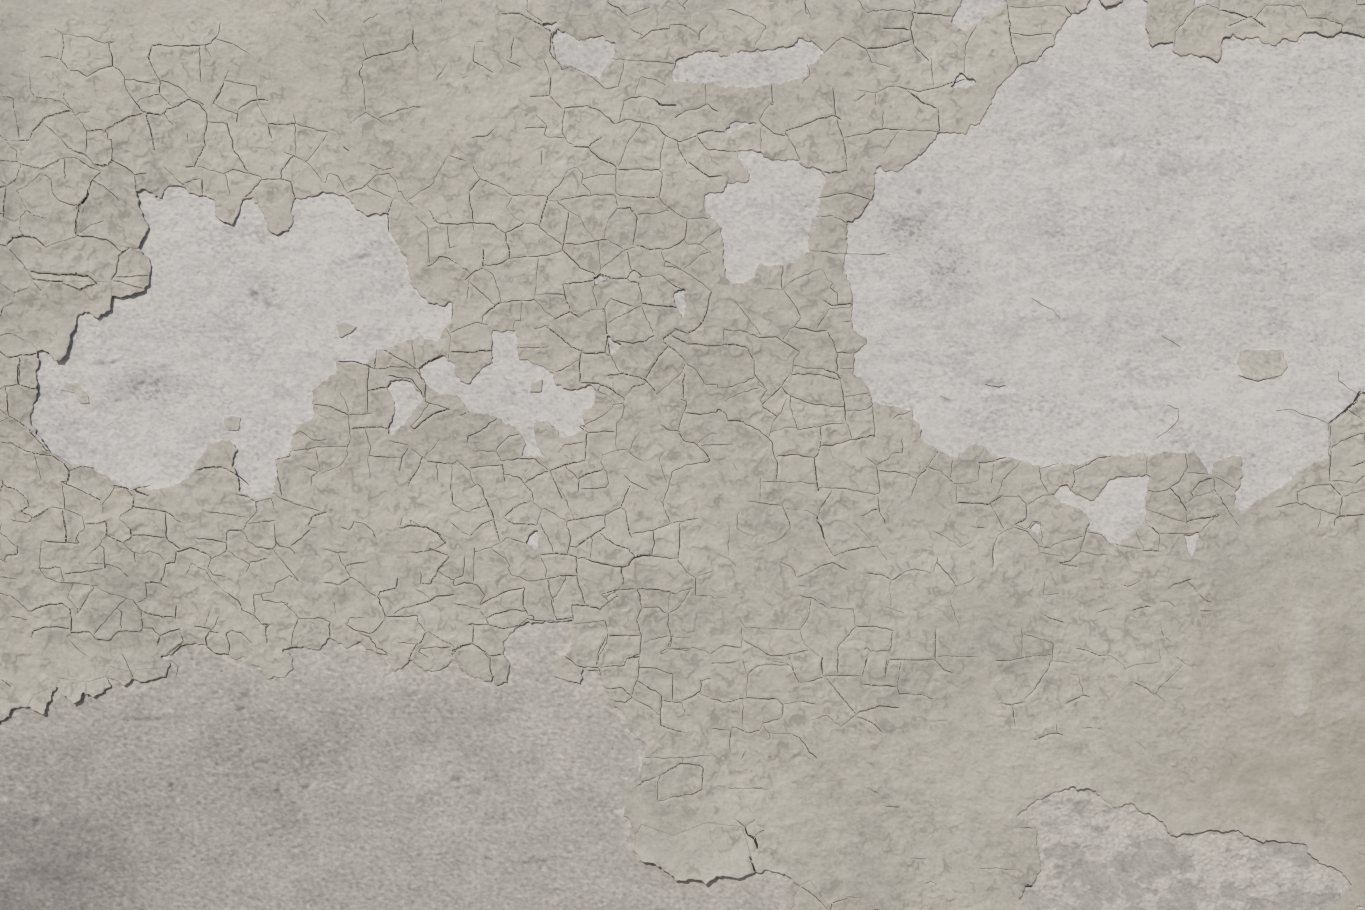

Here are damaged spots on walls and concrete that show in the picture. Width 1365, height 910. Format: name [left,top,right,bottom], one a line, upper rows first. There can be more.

peeling [672,38,823,89]
crack [1175,0,1365,32]
peeling [704,150,826,284]
peeling [843,0,1365,510]
peeling [28,179,596,500]
crack [0,0,1240,801]
peeling [1054,475,1150,547]
crack [1276,372,1365,529]
peeling [0,620,831,910]
crack [735,819,764,873]
crack [802,887,878,910]
peeling [1017,786,1351,910]